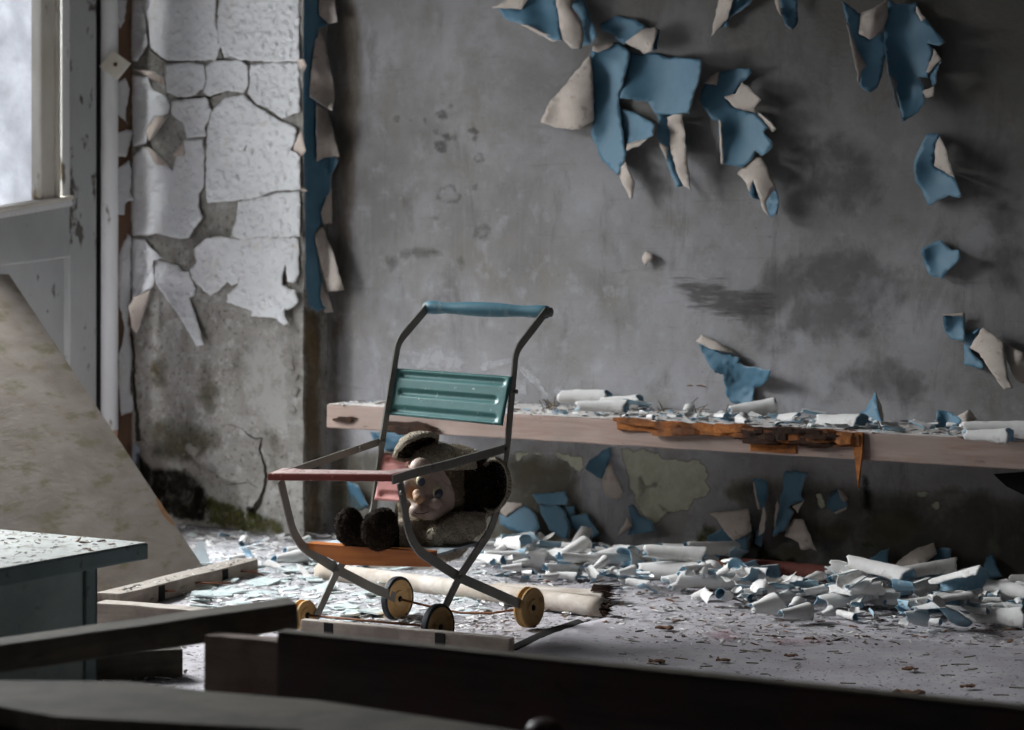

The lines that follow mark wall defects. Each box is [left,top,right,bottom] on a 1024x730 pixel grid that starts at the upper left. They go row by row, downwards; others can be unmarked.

peeling [492,0,779,218]
peeling [842,0,945,122]
peeling [118,0,344,416]
peeling [914,133,962,205]
peeling [920,240,961,279]
peeling [696,334,1024,444]
peeling [941,313,1024,390]
crack [220,425,268,513]
flaking render [476,447,1024,629]